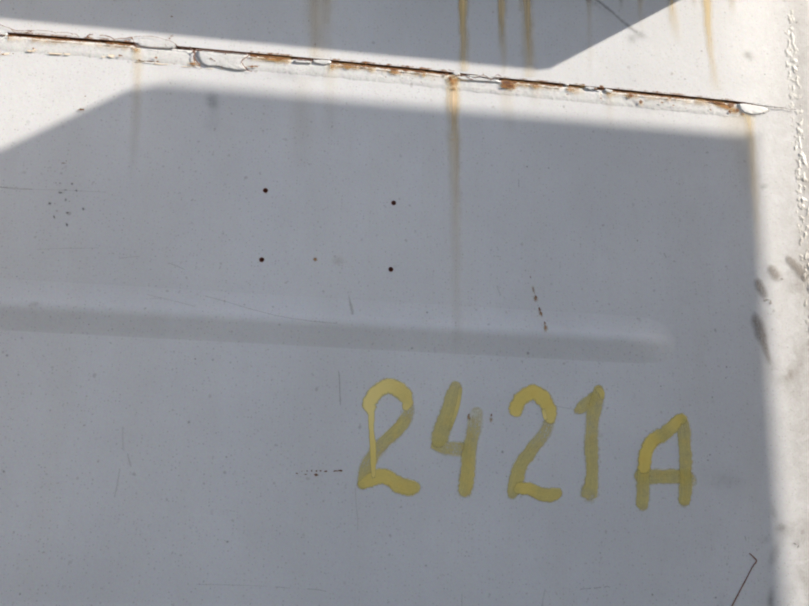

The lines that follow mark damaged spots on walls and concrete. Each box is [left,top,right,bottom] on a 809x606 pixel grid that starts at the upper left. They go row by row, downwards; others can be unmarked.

corrosion [459,0,467,46]
corrosion [8,32,159,62]
peeling [196,51,248,71]
corrosion [246,51,292,68]
corrosion [331,59,457,110]
corrosion [501,77,585,95]
corrosion [594,85,684,106]
corrosion [699,96,744,115]